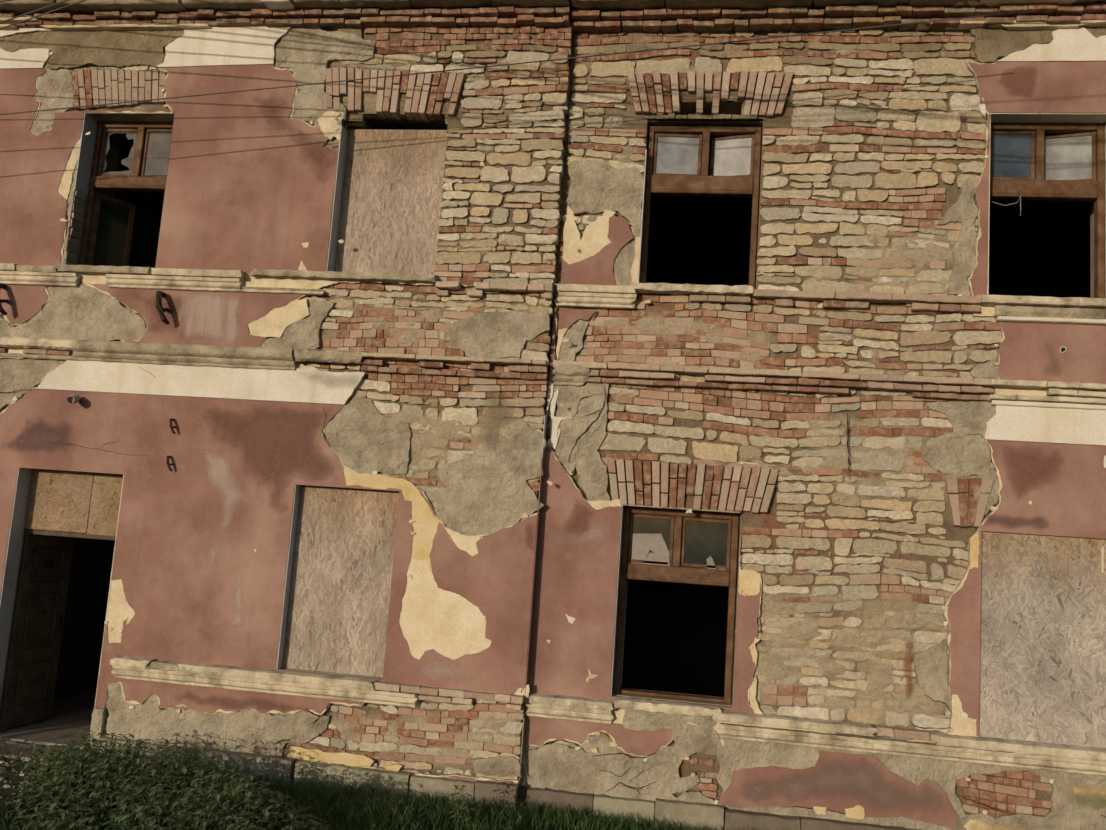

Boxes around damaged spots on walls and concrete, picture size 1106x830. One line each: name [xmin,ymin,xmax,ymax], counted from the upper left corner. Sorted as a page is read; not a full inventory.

flaking render [1084,27,1106,38]
flaking render [0,281,147,341]
flaking render [0,358,66,413]
flaking render [248,25,1056,740]
peeling [104,579,135,643]
flaking render [103,683,1106,830]